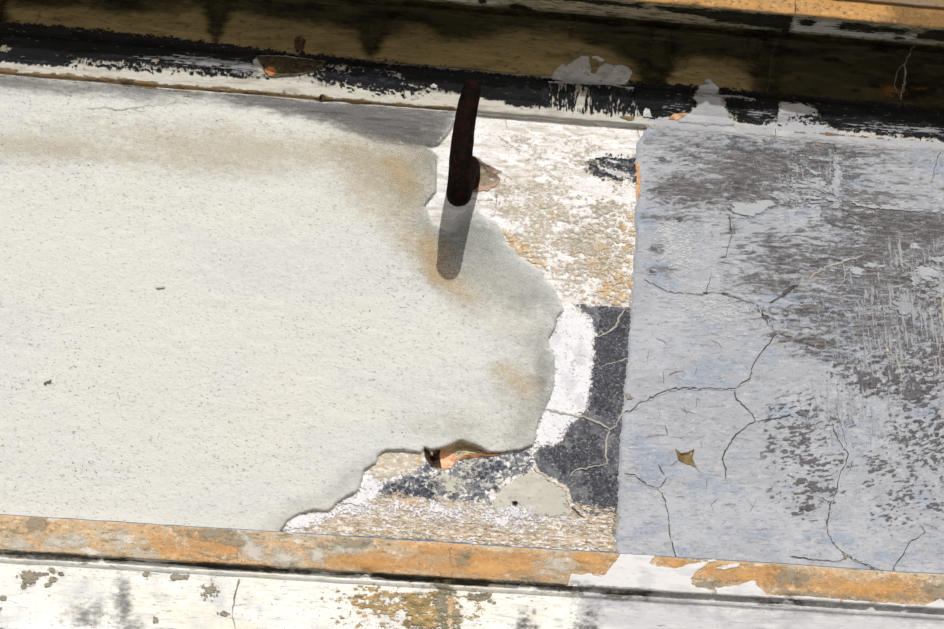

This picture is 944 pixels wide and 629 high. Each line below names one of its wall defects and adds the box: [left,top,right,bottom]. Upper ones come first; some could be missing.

peeling [0,20,698,120]
leakage [875,53,944,106]
crack [831,145,861,231]
crack [547,214,862,556]
peeling [473,87,944,526]
crack [884,343,902,403]
crack [936,278,944,375]
peeling [281,433,619,575]
crack [790,408,943,573]
peeling [15,567,64,589]
peeling [200,578,221,601]
peeling [319,579,496,629]